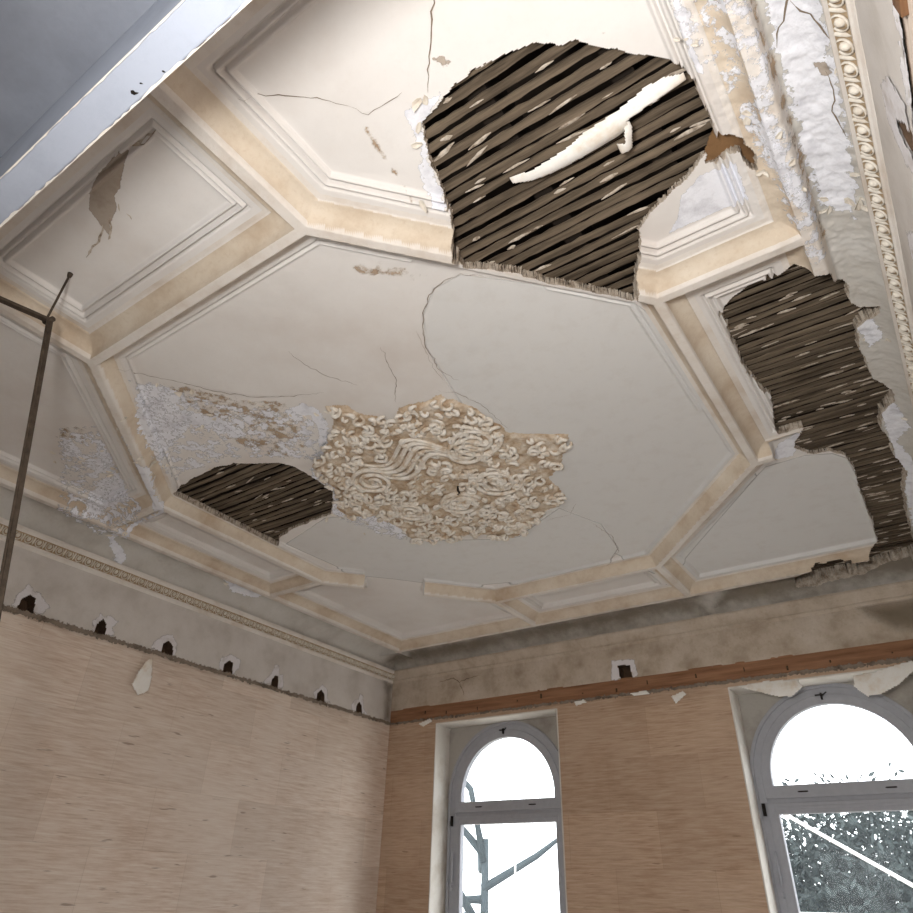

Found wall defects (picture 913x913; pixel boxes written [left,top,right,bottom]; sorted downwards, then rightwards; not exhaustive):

crack [427,0,435,87]
crack [776,0,829,40]
peeling [0,0,252,228]
crack [239,93,401,115]
crack [826,72,846,136]
peeling [87,129,156,256]
spalling [405,0,913,588]
crack [419,274,506,427]
spalling [50,380,406,564]
spalling [11,584,50,614]
spalling [92,613,119,638]
spalling [151,635,177,658]